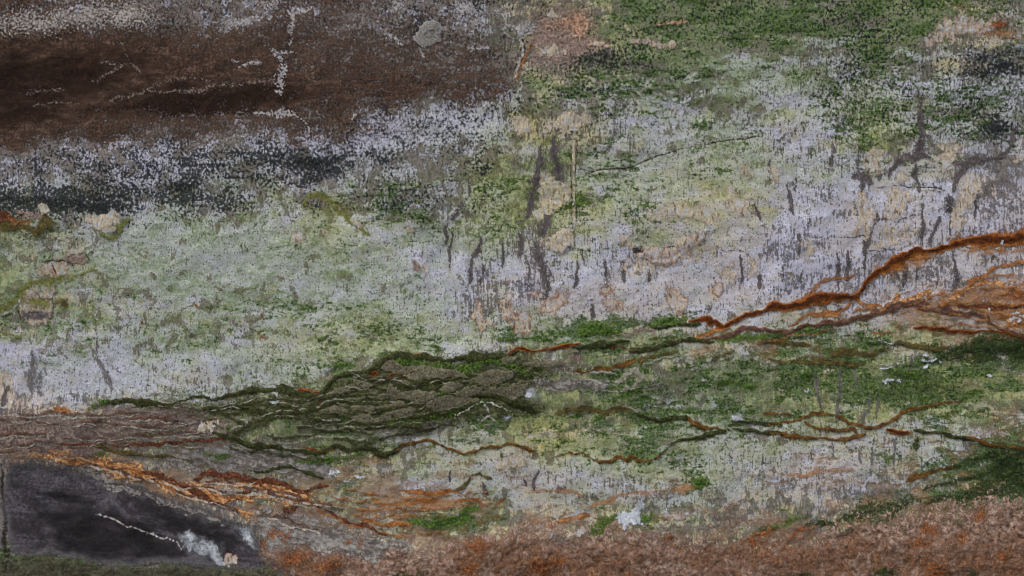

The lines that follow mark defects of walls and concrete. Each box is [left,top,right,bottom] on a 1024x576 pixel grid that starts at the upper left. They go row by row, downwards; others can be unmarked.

water stain [0,0,527,180]
mould [0,187,131,217]
water stain [442,178,472,273]
water stain [467,236,485,286]
water stain [517,135,567,299]
water stain [572,249,584,288]
rust [509,225,1024,355]
water stain [785,177,798,215]
water stain [836,89,1019,292]
rust [552,401,1024,464]
rust [0,404,537,576]
efflorescence [181,531,230,567]